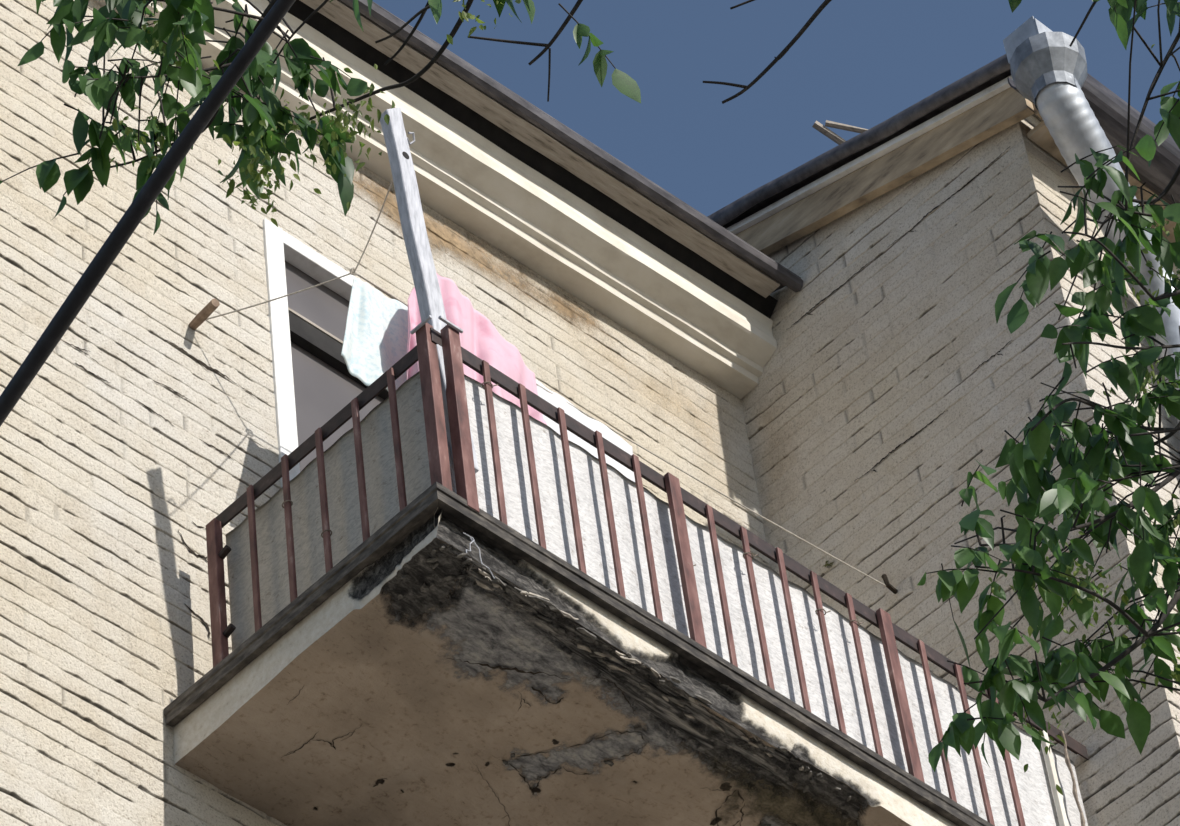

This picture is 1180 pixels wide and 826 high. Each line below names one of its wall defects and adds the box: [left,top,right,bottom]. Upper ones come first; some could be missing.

crack [281,726,361,758]
spalling [348,509,880,826]